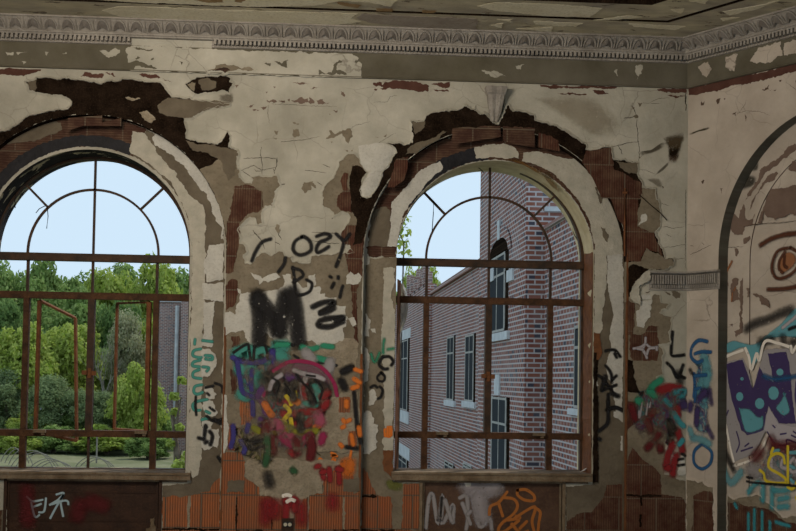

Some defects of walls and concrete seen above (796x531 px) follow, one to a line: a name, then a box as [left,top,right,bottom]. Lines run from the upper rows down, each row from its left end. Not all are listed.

peeling [0,68,41,76]
peeling [100,48,120,58]
peeling [125,45,362,97]
peeling [657,40,796,105]
crack [241,137,317,185]
peeling [731,144,796,256]
flaking render [0,72,716,531]
peeling [727,278,770,336]
flaking render [726,492,796,531]